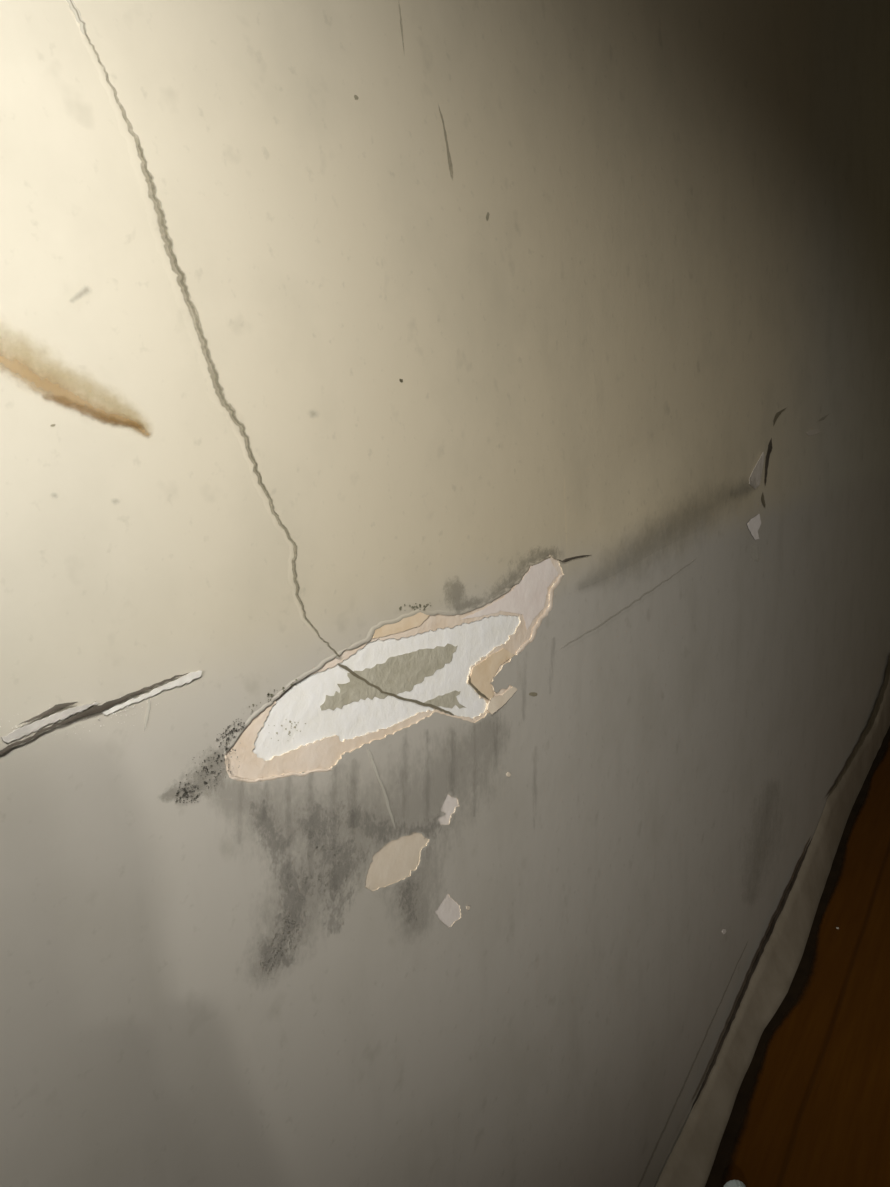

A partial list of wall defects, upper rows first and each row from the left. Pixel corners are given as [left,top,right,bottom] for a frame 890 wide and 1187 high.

crack [64,0,341,659]
rust [0,356,149,435]
spalling [747,514,761,540]
peeling [224,555,565,783]
crack [0,671,202,754]
leakage [175,679,297,803]
peeling [438,794,459,825]
peeling [365,832,429,891]
peeling [435,894,470,927]